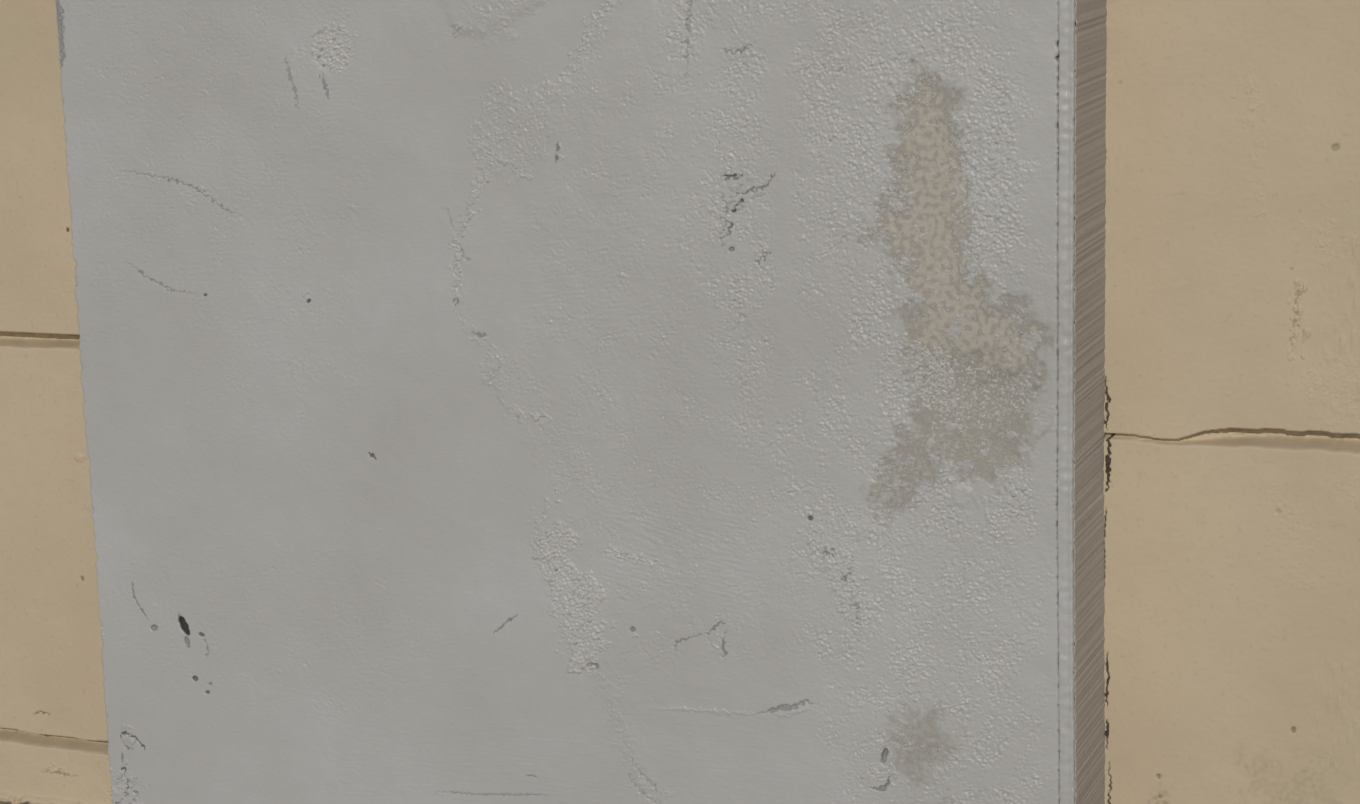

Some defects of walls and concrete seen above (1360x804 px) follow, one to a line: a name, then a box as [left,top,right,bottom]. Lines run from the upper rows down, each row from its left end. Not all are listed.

peeling [719,174,775,251]